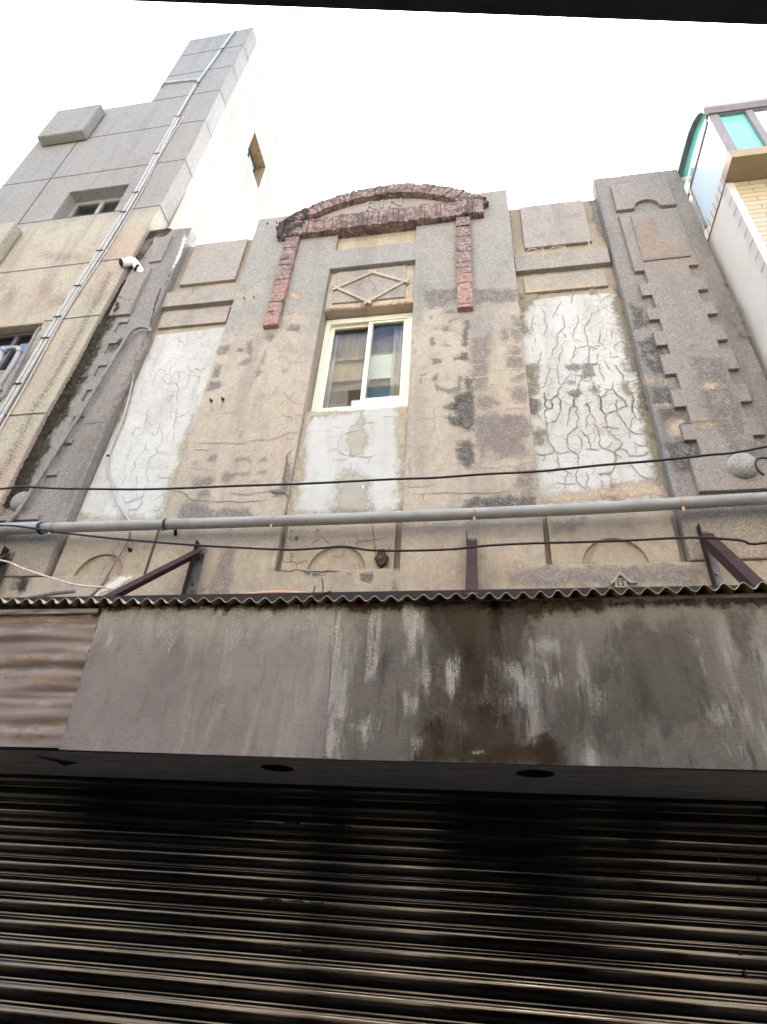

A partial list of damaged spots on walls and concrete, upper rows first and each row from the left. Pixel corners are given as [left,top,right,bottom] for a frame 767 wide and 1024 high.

damp [3,280,126,507]
crack [83,274,302,518]
crack [282,524,392,572]
crack [330,416,392,470]
damp [519,292,537,333]
damp [526,364,539,415]
crack [406,241,721,502]
damp [566,364,601,397]
damp [612,288,671,498]
damp [97,551,767,765]